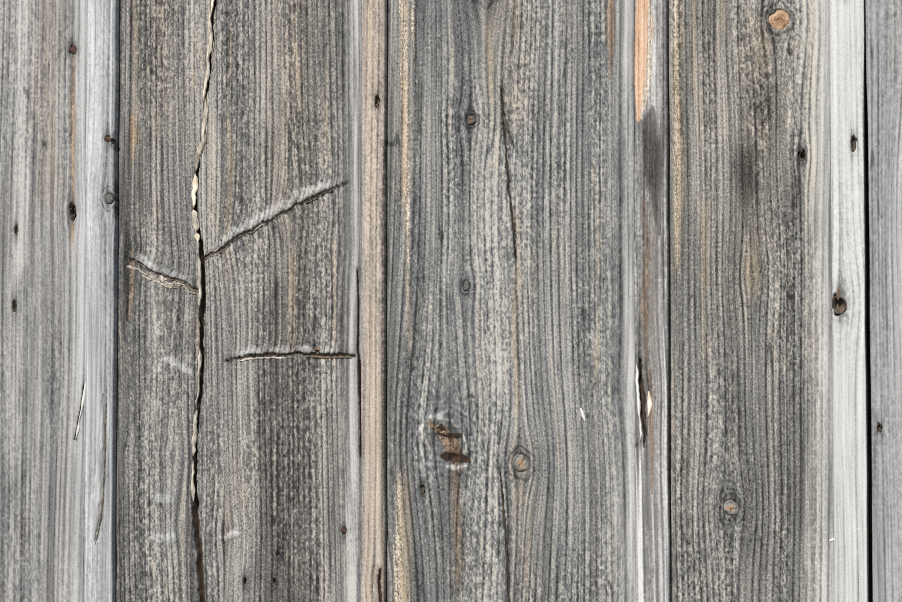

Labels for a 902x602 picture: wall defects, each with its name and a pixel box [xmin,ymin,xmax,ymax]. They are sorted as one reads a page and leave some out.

crack [500,88,516,258]
crack [127,0,362,602]
crack [635,360,653,447]